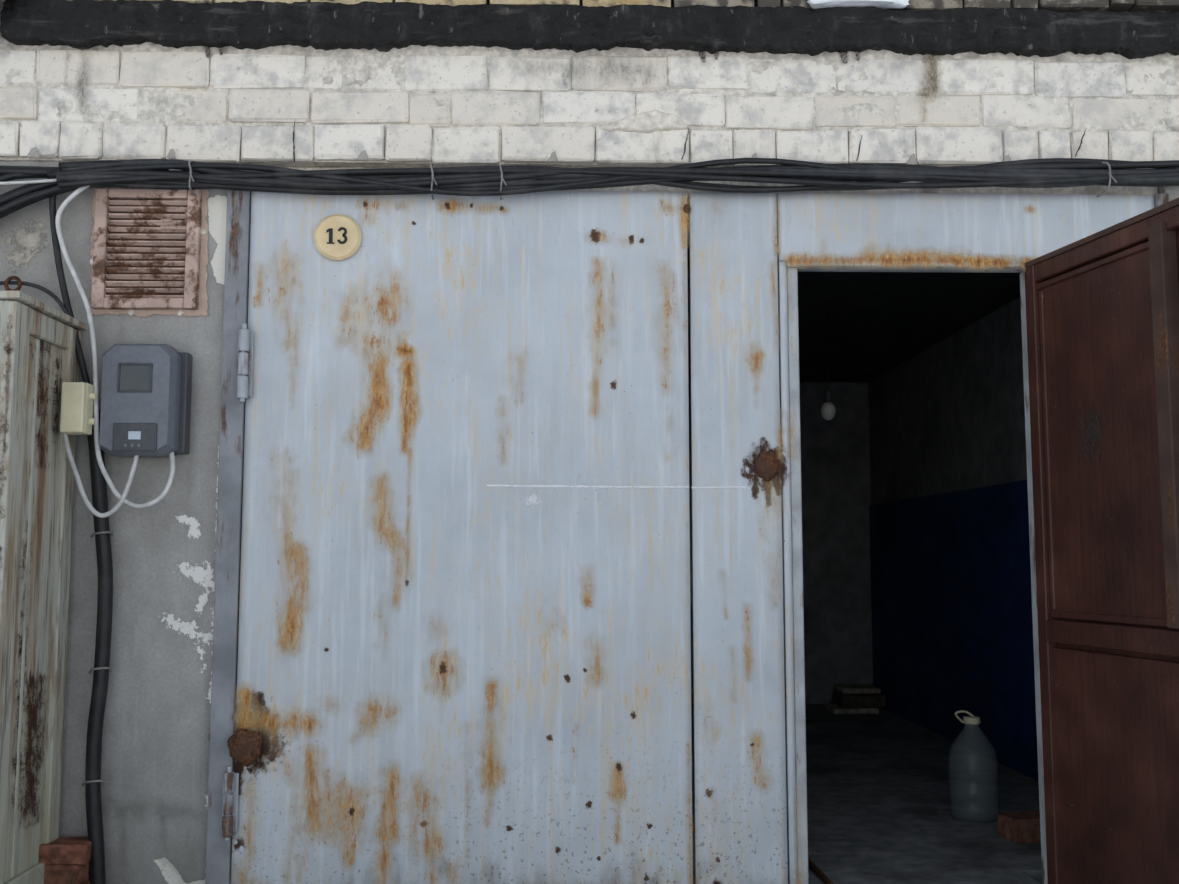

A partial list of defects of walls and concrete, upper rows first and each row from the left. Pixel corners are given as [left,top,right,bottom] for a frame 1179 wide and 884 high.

rust [589,229,604,242]
rust [773,228,1032,281]
rust [342,273,418,475]
rust [741,417,793,506]
peeling [175,514,201,539]
peeling [159,550,216,704]
rust [277,532,308,650]
rust [430,651,454,690]
rust [233,688,443,884]
rust [466,683,505,789]
rust [610,763,626,797]
spalling [154,857,206,884]